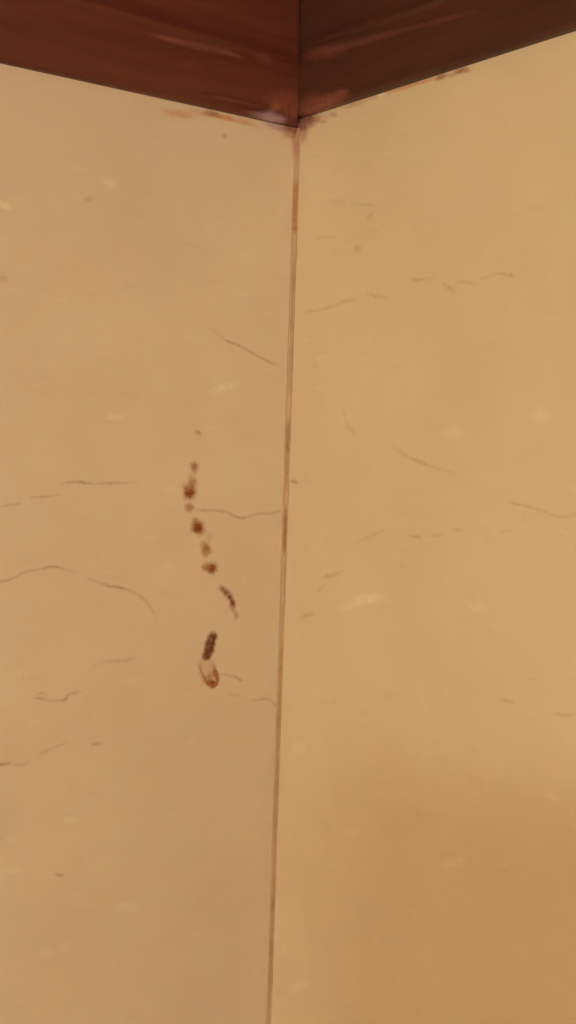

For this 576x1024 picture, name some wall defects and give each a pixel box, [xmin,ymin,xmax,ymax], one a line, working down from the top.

crack [194,242,296,558]
crack [0,478,140,509]
crack [0,564,159,623]
rust [180,459,240,624]
rust [196,630,245,690]
crack [227,607,285,1024]